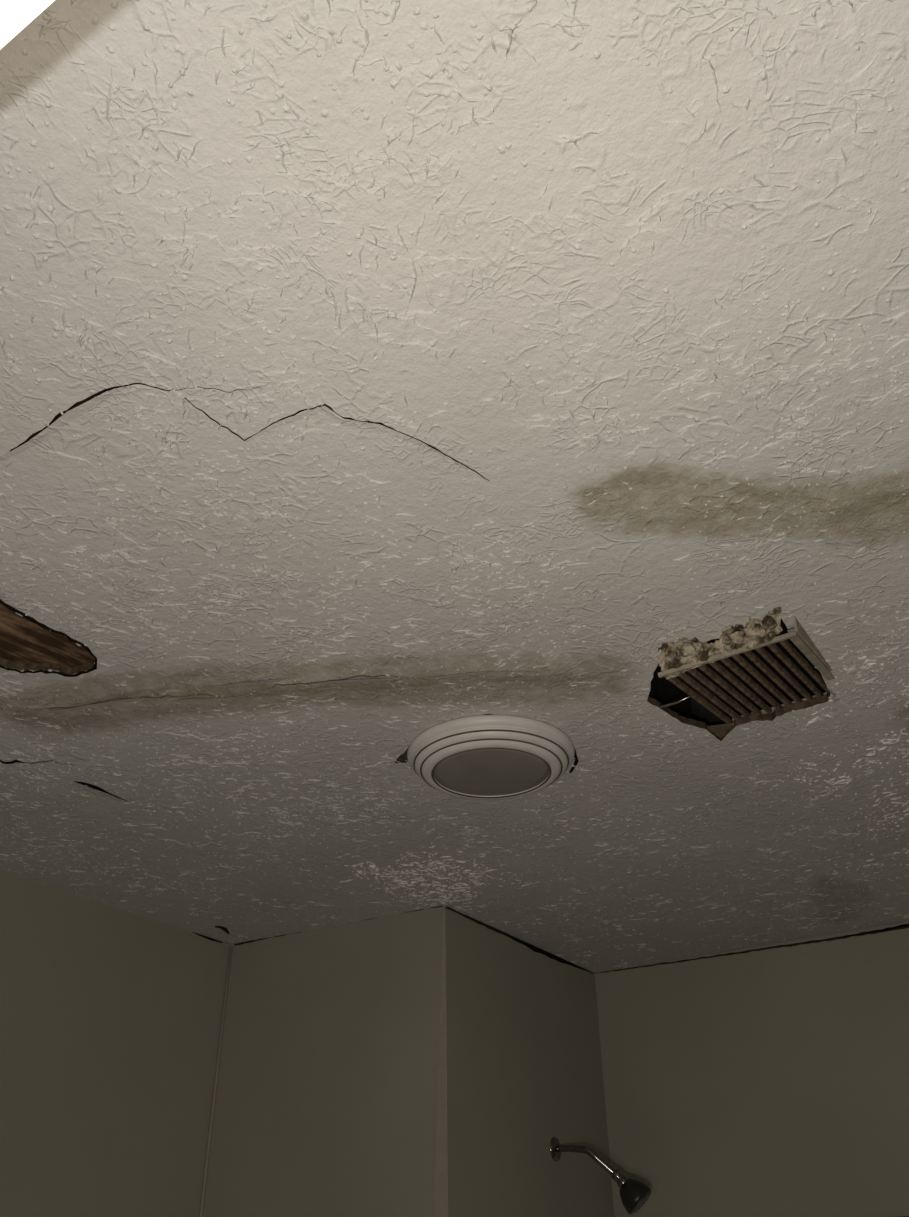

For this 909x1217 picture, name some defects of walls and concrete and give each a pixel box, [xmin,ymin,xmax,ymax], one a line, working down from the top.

crack [0,383,490,481]
damp [582,472,909,540]
peeling [0,599,97,677]
spalling [657,607,783,679]
crack [0,750,74,766]